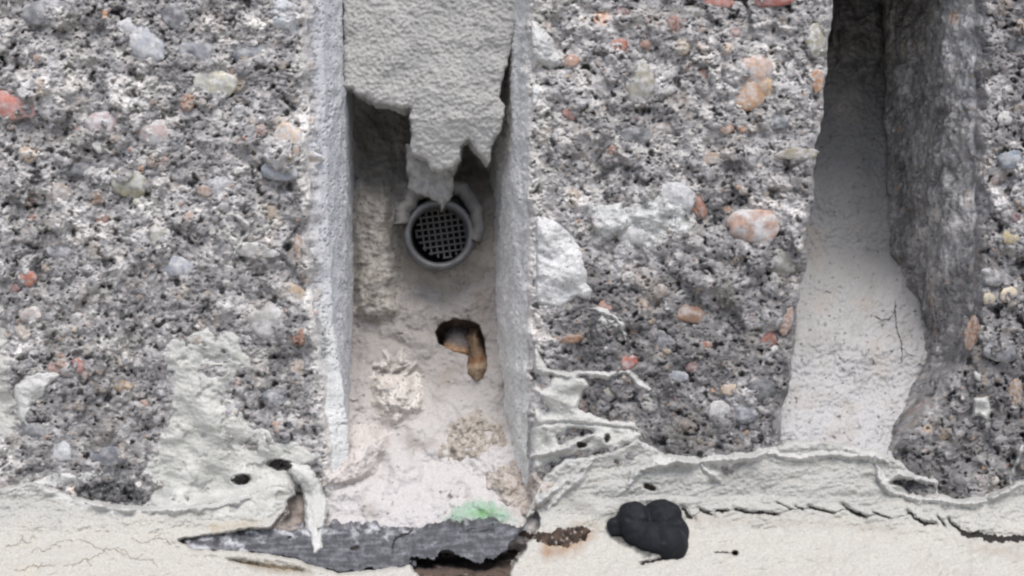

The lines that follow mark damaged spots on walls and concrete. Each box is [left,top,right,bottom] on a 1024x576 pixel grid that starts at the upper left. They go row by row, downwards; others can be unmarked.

crack [5,533,172,571]
hole [411,549,519,576]
rust [531,526,591,554]
crack [681,502,1024,544]